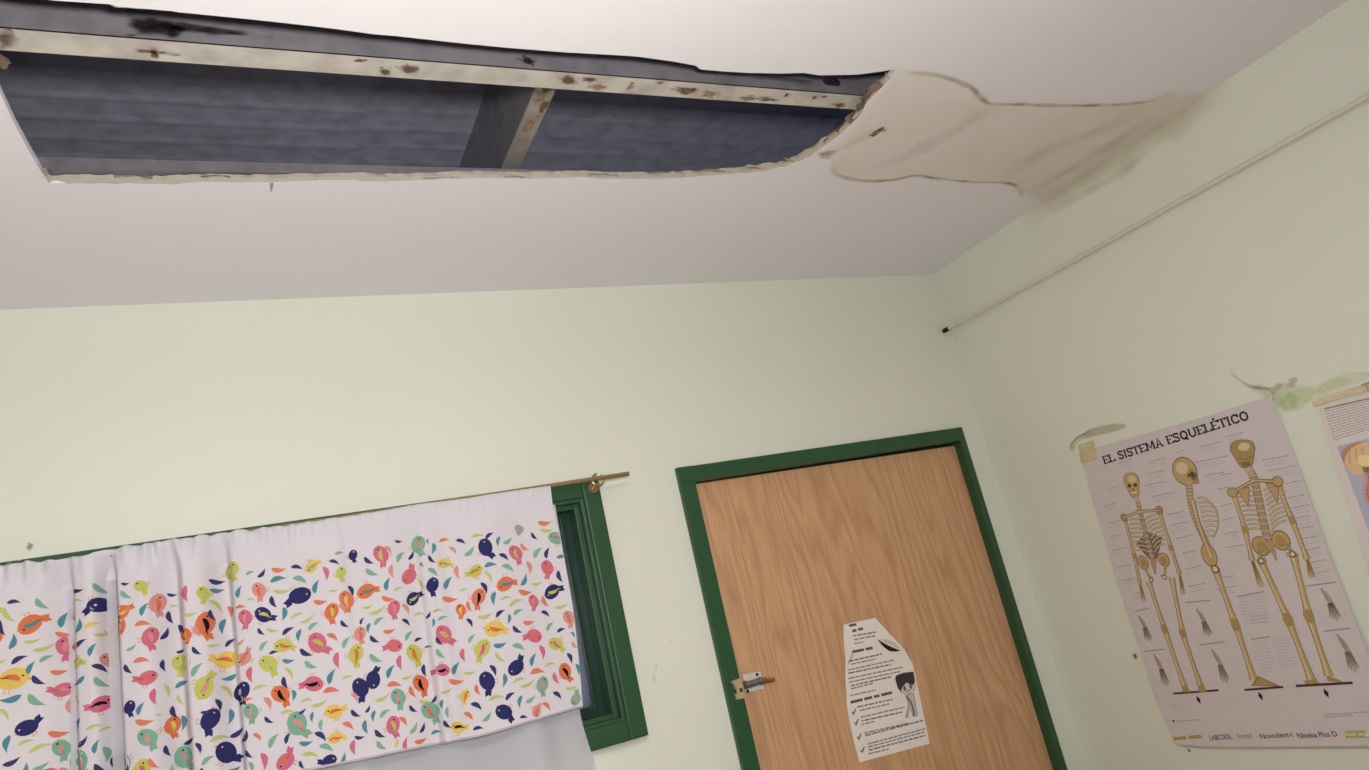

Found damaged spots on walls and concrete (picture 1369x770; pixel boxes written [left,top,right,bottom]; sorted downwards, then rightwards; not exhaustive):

spalling [0,46,11,69]
corrosion [355,59,419,75]
spalling [41,72,890,192]
corrosion [520,76,606,140]
corrosion [678,88,715,96]
water stain [821,64,1213,205]